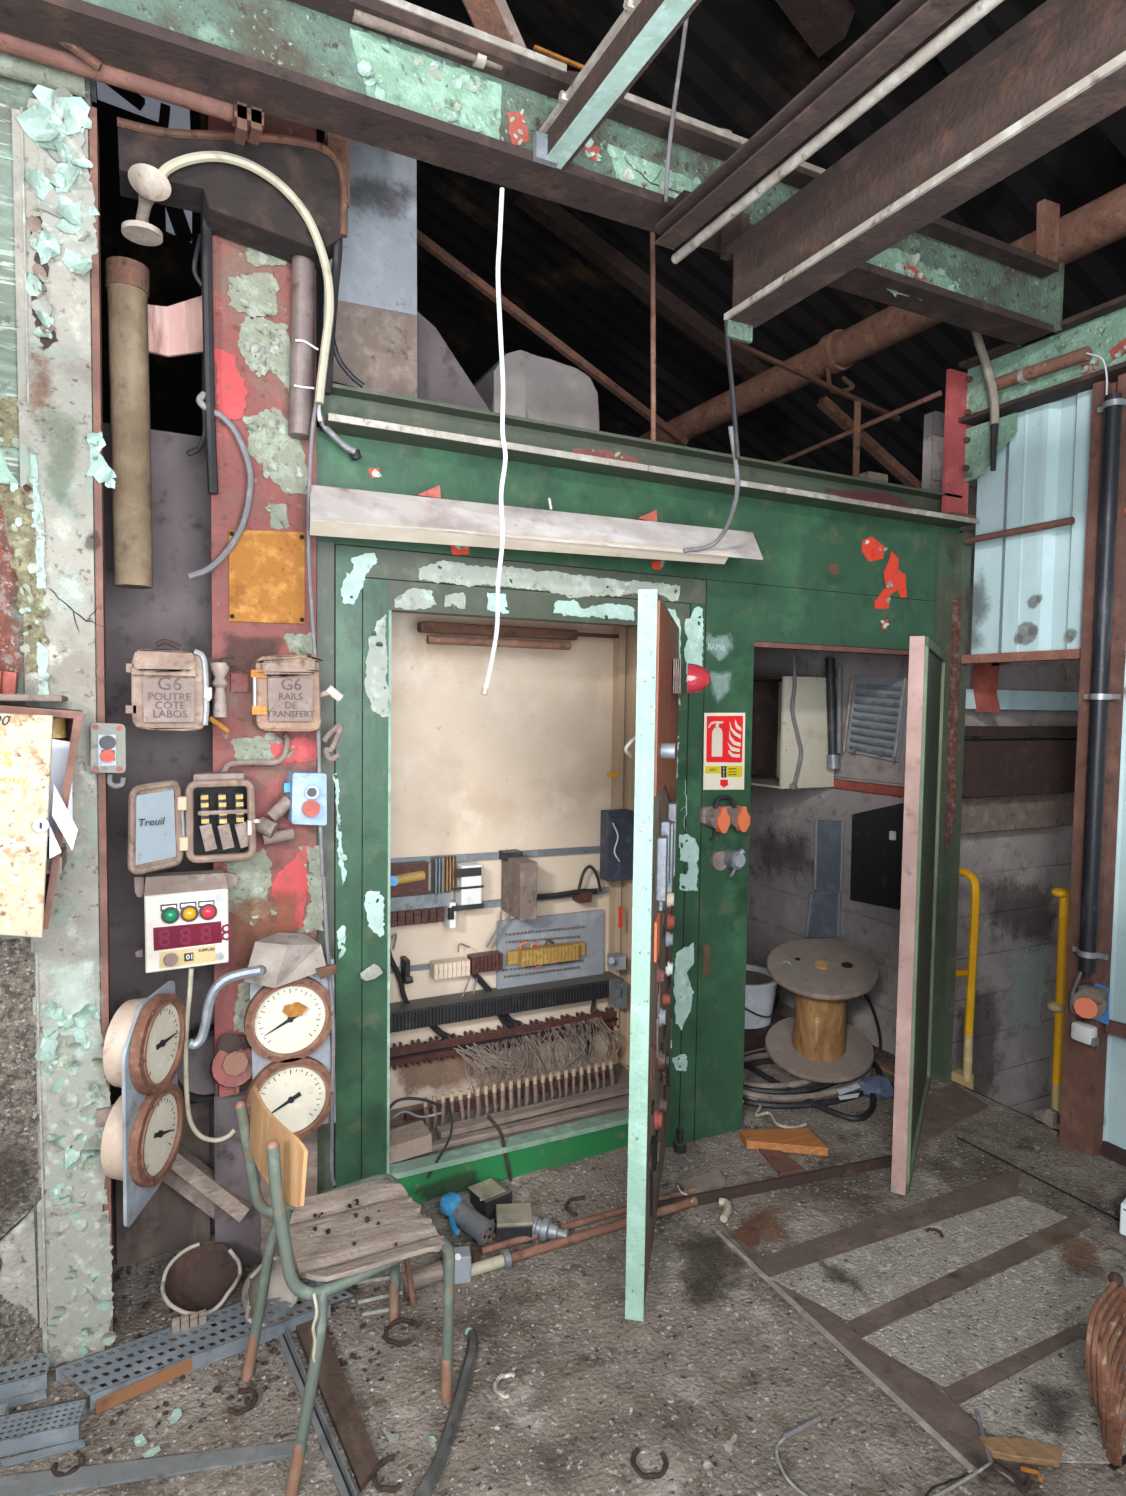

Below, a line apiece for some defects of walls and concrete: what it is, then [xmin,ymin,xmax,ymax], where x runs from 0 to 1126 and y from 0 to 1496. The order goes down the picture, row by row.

peeling [16,85,100,350]
peeling [214,247,308,530]
peeling [1010,338,1126,400]
rust [0,505,25,673]
peeling [0,397,50,708]
peeling [35,998,117,1362]